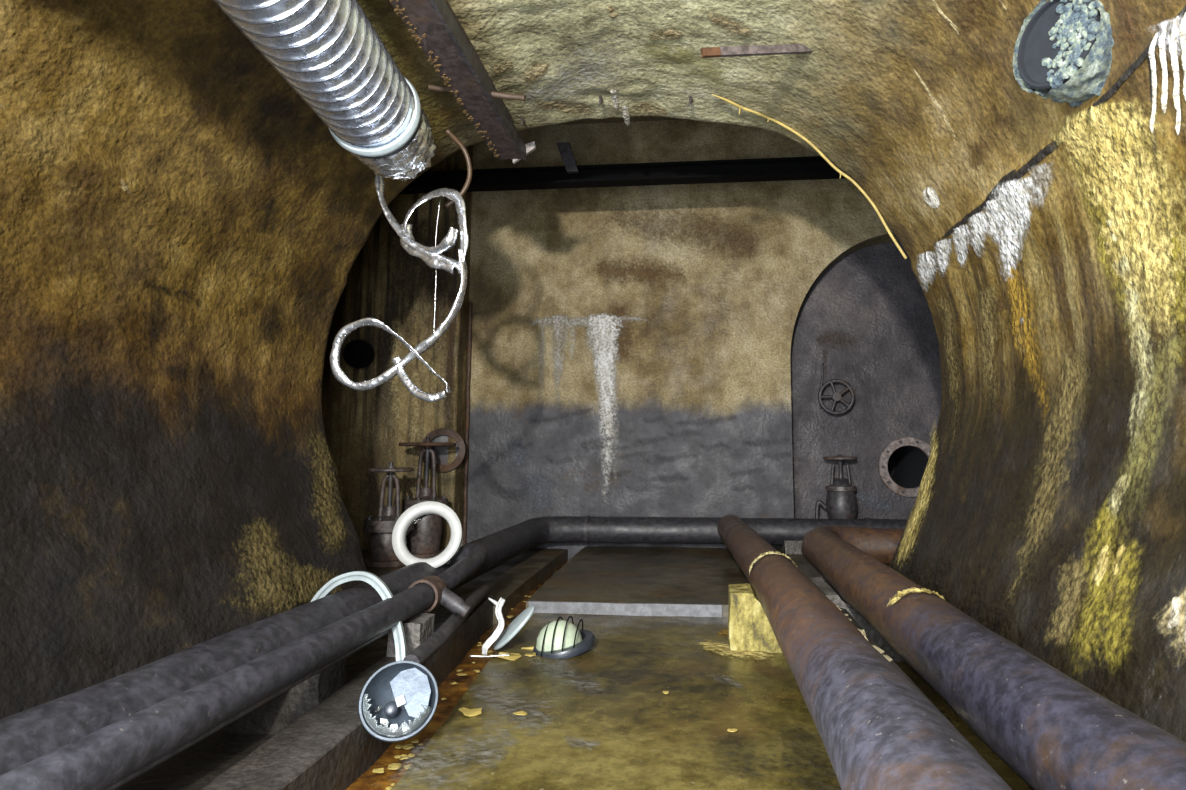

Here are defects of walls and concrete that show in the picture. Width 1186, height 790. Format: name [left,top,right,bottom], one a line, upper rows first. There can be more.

crack [935,6,1186,245]
water stain [1012,0,1186,420]
water stain [533,314,641,494]
water stain [917,164,1083,597]
water stain [1046,475,1137,663]